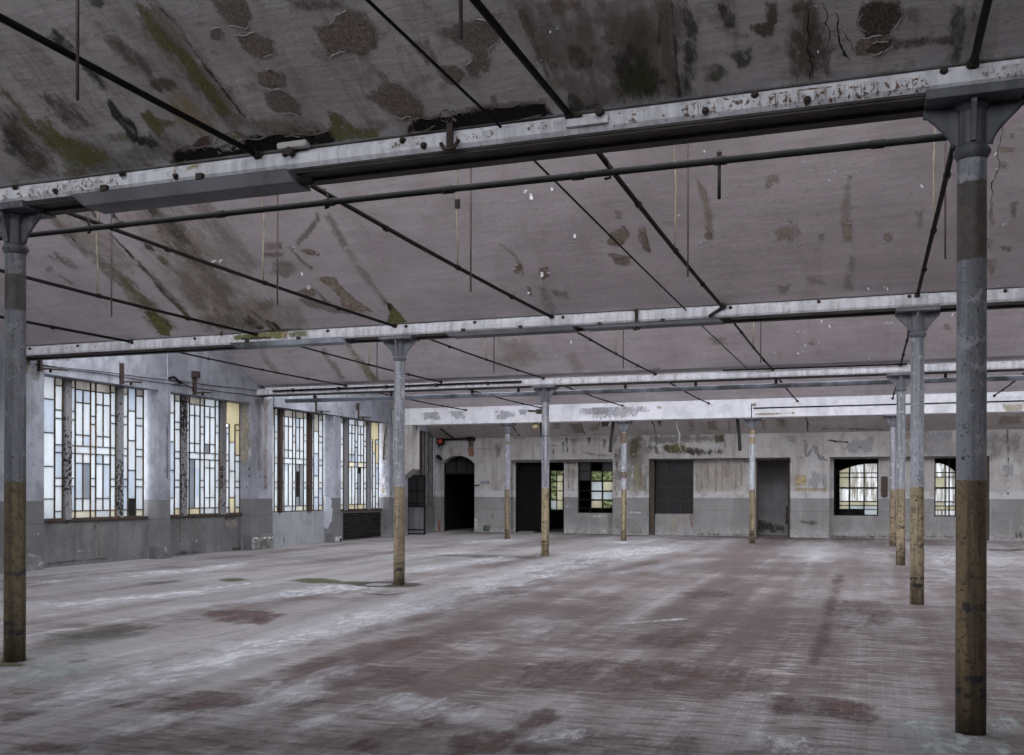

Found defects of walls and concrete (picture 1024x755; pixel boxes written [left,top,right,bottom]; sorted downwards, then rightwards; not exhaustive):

water stain [2,88,58,177]
mould [83,66,159,149]
flaking render [169,0,336,164]
spalling [314,8,378,58]
spalling [417,18,499,85]
water stain [517,0,698,112]
corrosion [681,78,928,118]
crack [836,13,854,60]
spalling [840,0,918,56]
crack [991,127,1003,199]
water stain [552,421,727,494]
spalling [324,496,386,541]